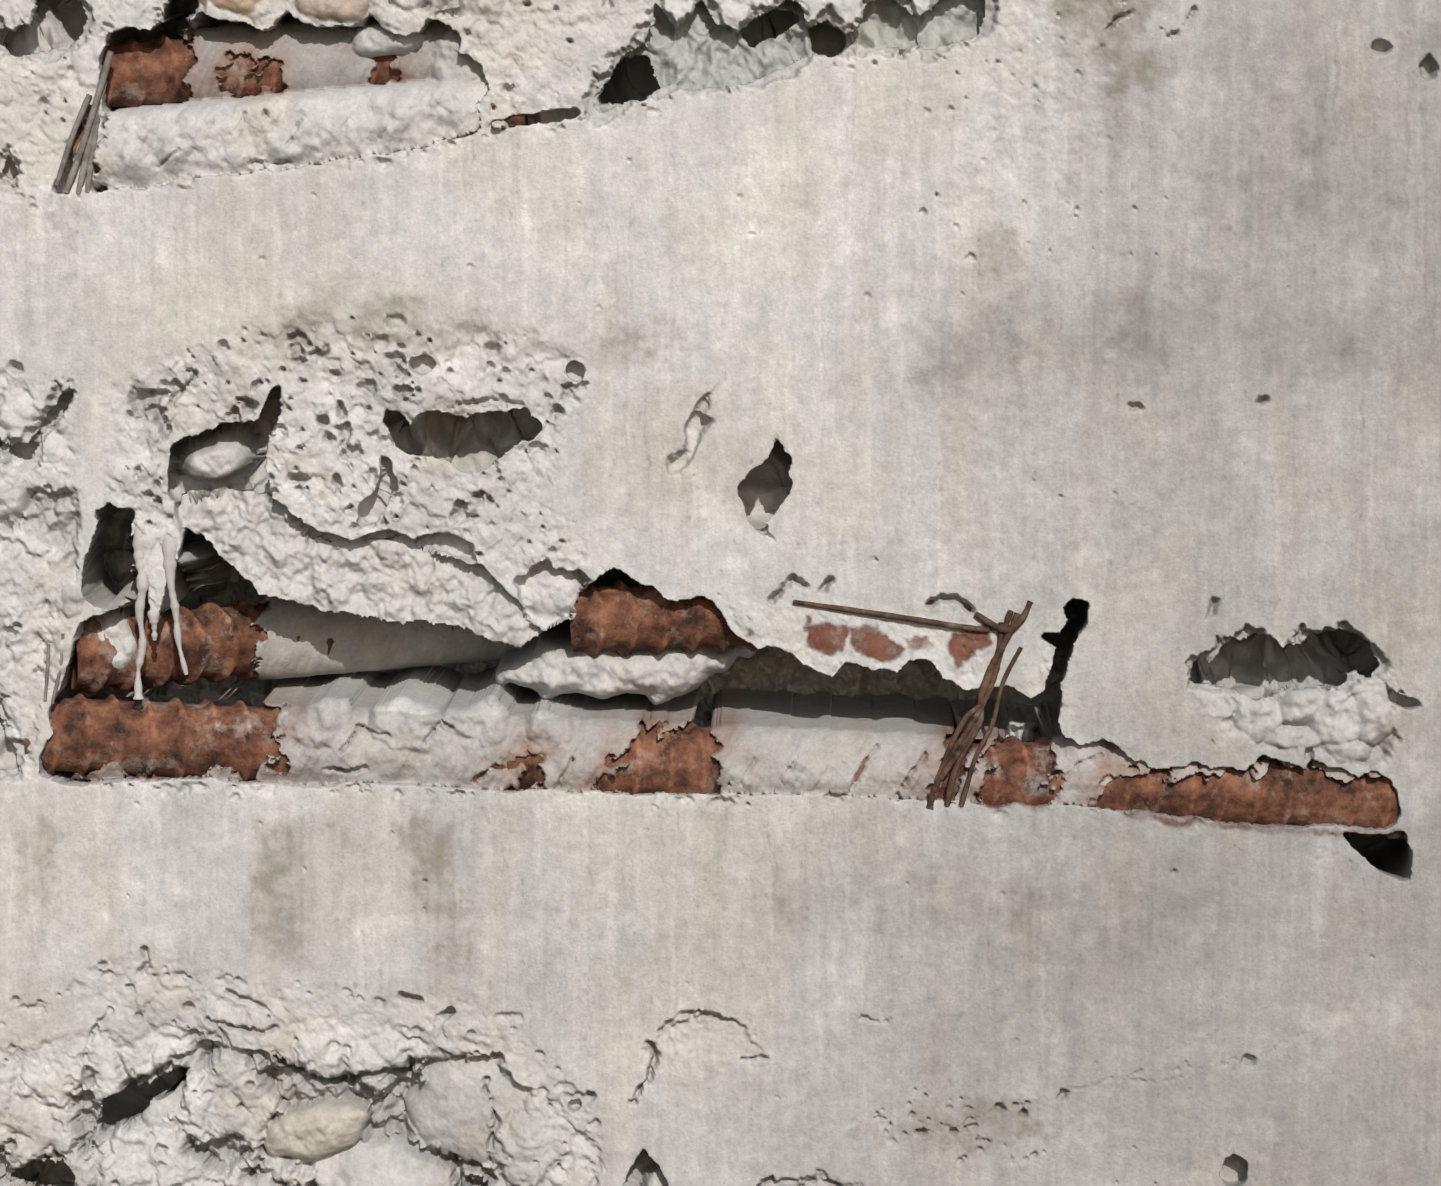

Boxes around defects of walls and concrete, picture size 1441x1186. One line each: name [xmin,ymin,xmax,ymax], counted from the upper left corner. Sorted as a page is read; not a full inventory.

spalling [0,0,87,59]
spalling [101,0,228,108]
spalling [216,52,288,98]
spalling [368,55,401,85]
peeling [591,0,1136,274]
spalling [0,299,1433,882]
rust [804,616,927,662]
rust [949,623,993,667]
rust [1155,816,1197,826]
spalling [96,1066,189,1133]
spalling [7,1155,76,1186]
spalling [623,1148,668,1186]